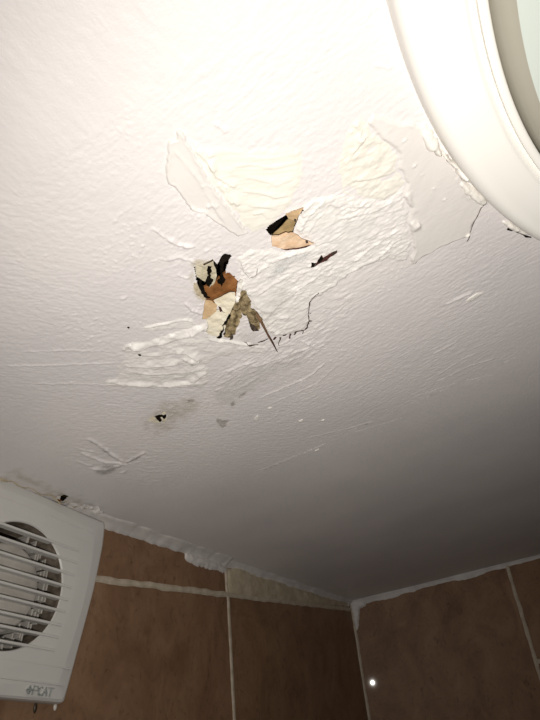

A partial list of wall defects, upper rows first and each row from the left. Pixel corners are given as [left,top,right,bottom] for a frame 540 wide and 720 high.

spalling [266,208,314,250]
spalling [194,254,278,352]
crack [245,293,319,347]